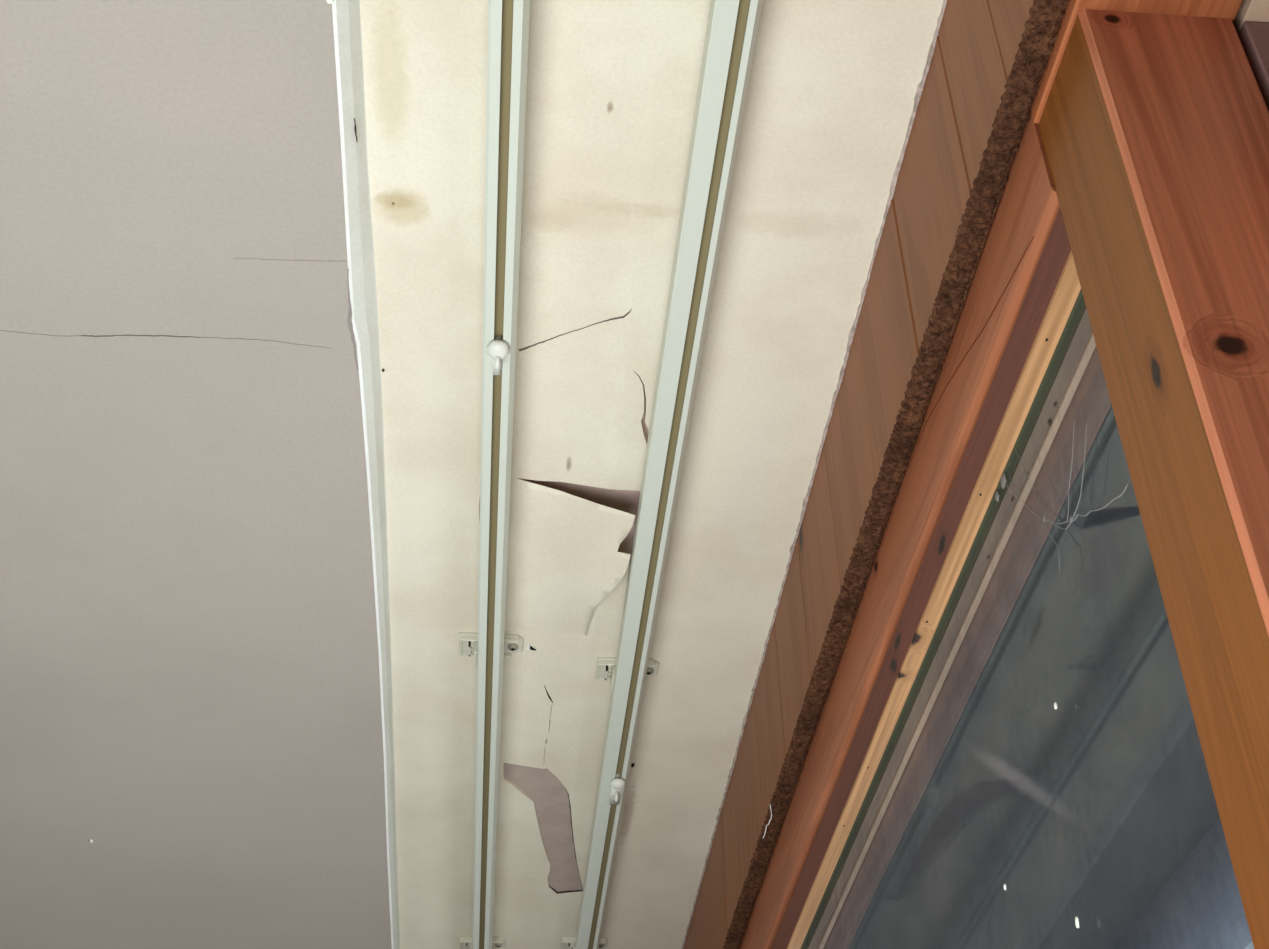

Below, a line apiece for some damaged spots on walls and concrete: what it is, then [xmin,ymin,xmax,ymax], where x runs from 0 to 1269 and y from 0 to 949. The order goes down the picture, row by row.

crack [233,256,346,264]
crack [0,330,332,349]
crack [519,309,632,351]
peeling [515,478,640,636]
spalling [504,763,583,894]